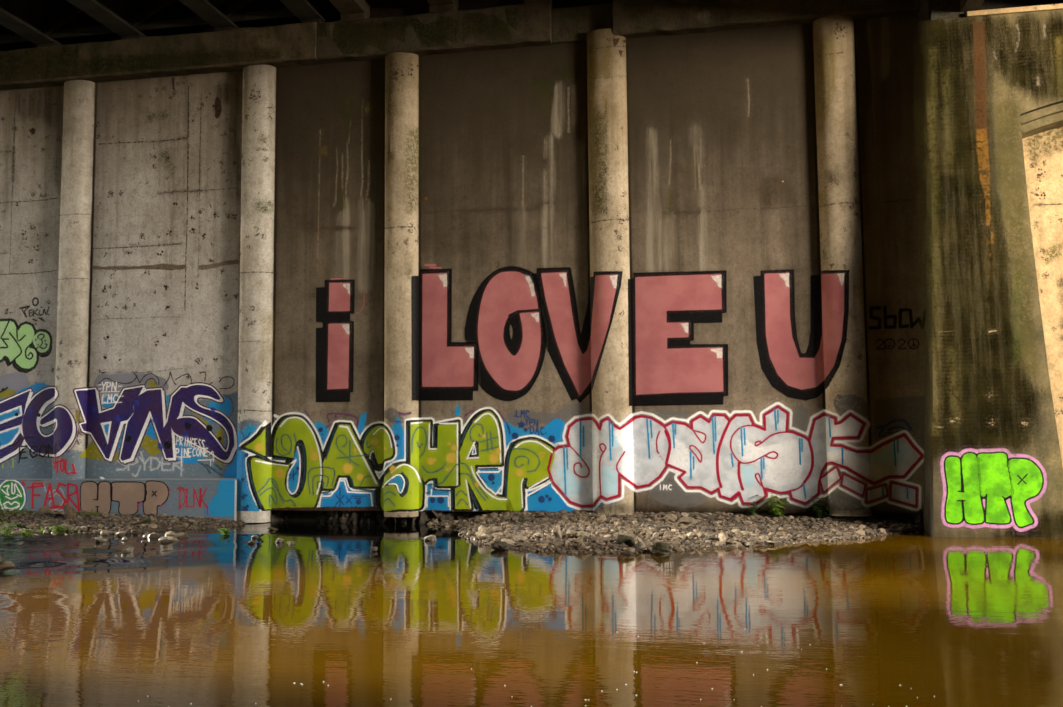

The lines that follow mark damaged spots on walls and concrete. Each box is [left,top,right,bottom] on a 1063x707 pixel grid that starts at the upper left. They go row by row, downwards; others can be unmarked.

water stain [314,90,382,301]
water stain [511,37,622,275]
water stain [637,117,717,272]
water stain [811,27,844,142]
water stain [859,0,1063,485]
water stain [974,485,1063,538]